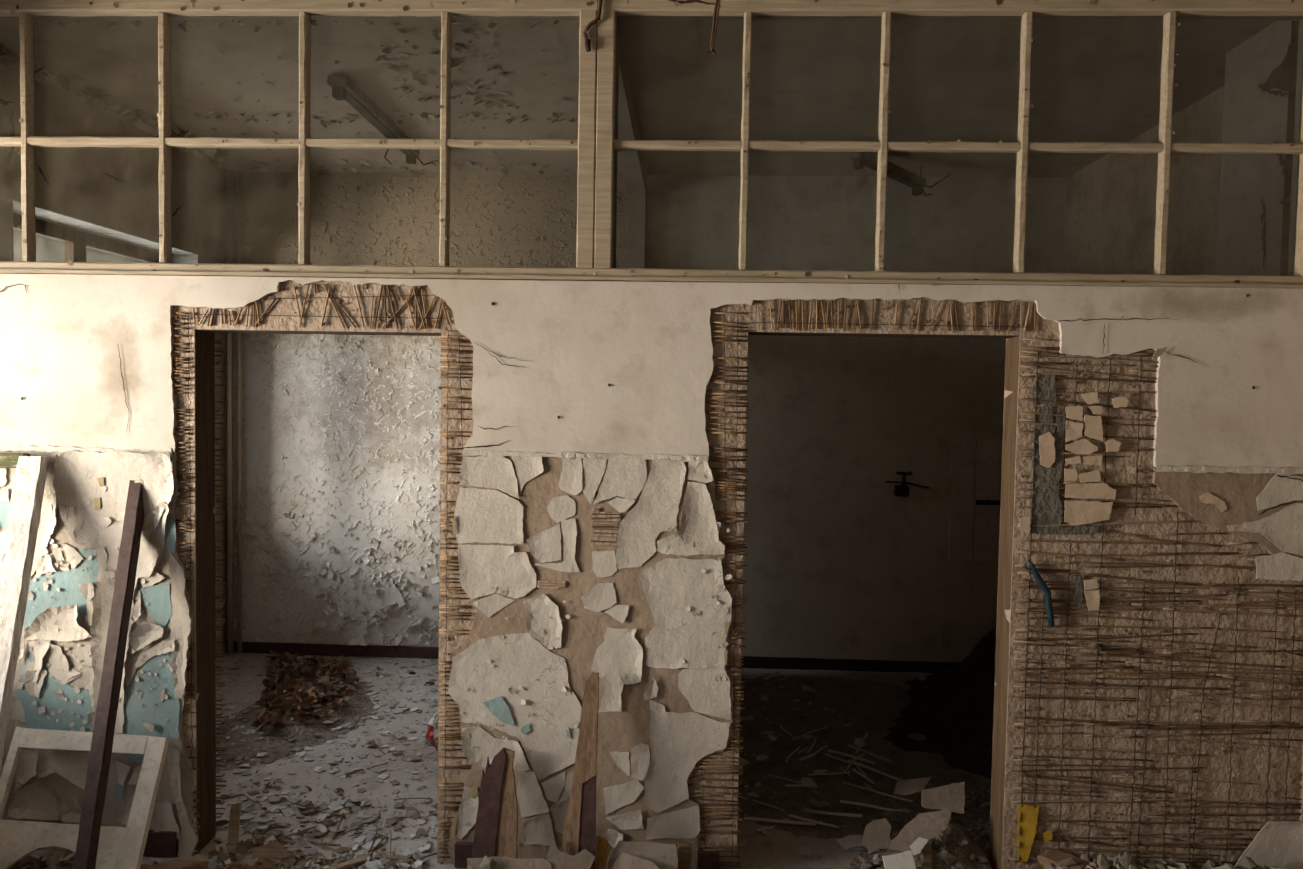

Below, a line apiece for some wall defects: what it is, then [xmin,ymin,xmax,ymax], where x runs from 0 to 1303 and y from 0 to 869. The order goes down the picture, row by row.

peeling [20,0,319,63]
peeling [374,20,578,146]
flaking render [1260,37,1298,93]
peeling [0,43,596,276]
peeling [0,468,10,562]
peeling [6,283,1303,869]